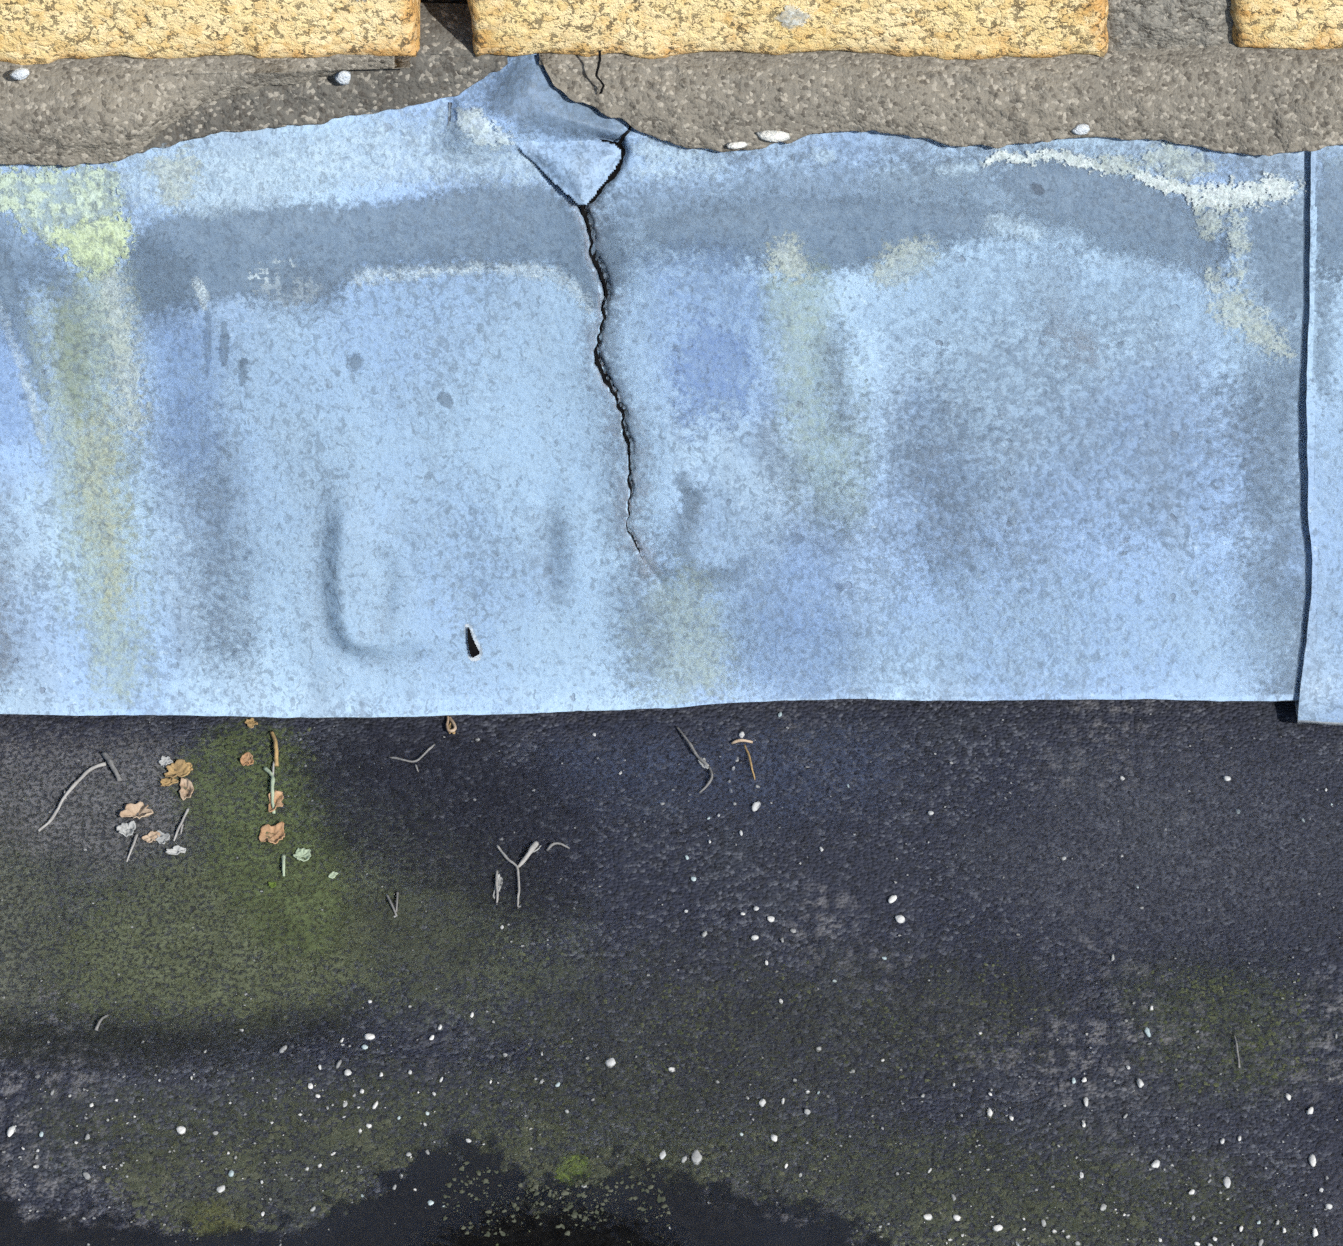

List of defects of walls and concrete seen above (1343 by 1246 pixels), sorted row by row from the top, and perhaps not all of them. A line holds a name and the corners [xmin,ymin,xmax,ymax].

crack [445,102,453,132]
crack [595,50,605,94]
crack [515,125,666,582]
damp [0,54,1343,702]